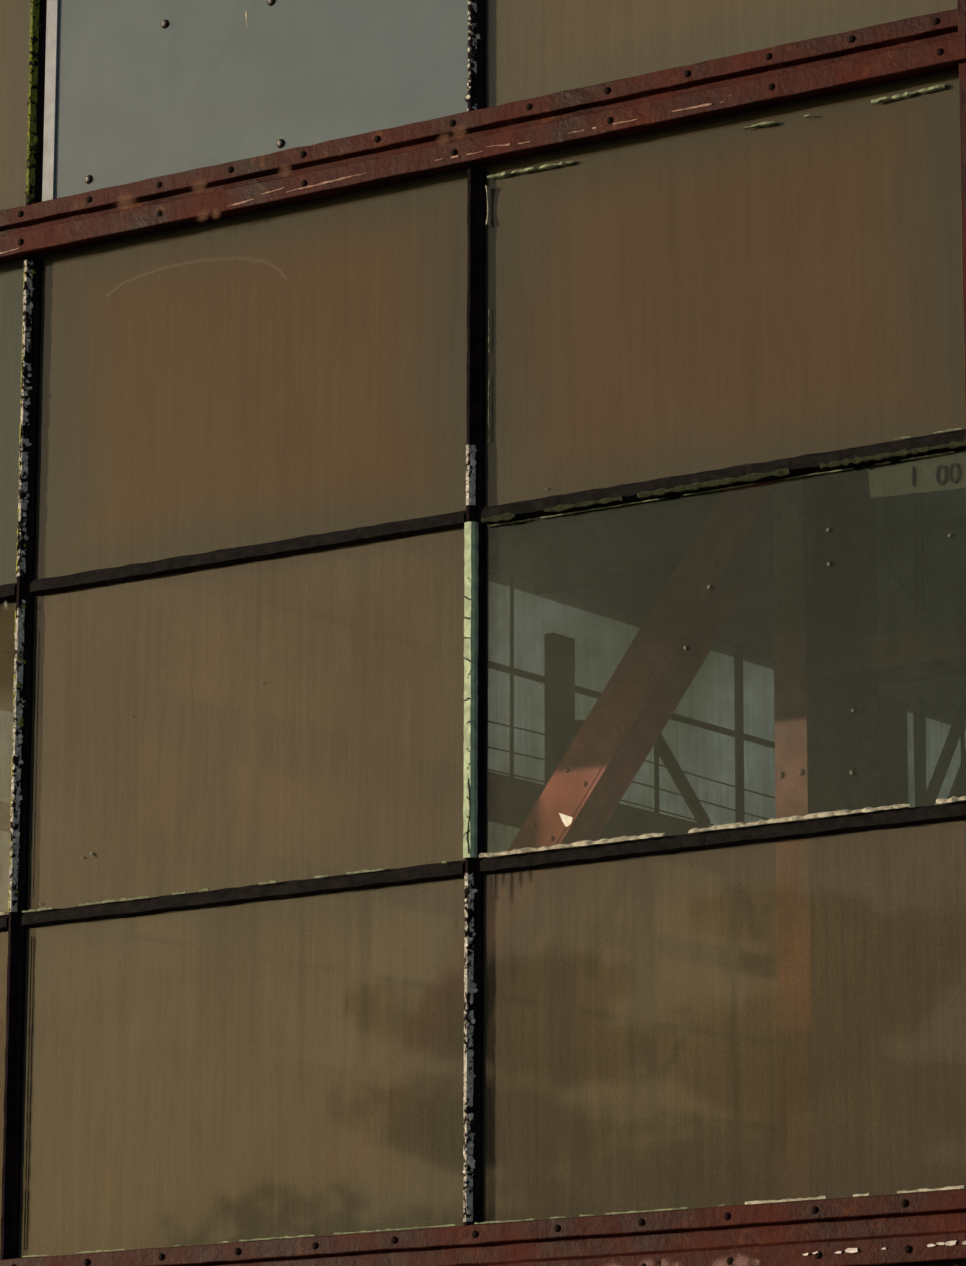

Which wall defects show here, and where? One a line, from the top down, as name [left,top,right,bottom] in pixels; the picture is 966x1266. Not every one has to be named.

peeling [467,1,480,111]
peeling [16,260,35,577]
peeling [466,445,477,505]
peeling [8,600,26,912]
peeling [463,873,478,1222]